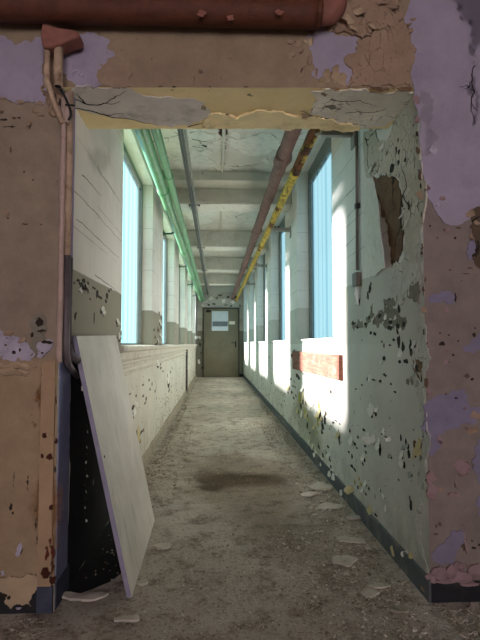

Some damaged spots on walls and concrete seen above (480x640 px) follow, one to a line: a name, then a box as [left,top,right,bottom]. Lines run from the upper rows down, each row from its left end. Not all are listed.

peeling [0,35,61,129]
crack [75,91,157,126]
crack [302,99,382,174]
crack [463,65,478,123]
peeling [63,0,480,512]
peeling [0,313,54,362]